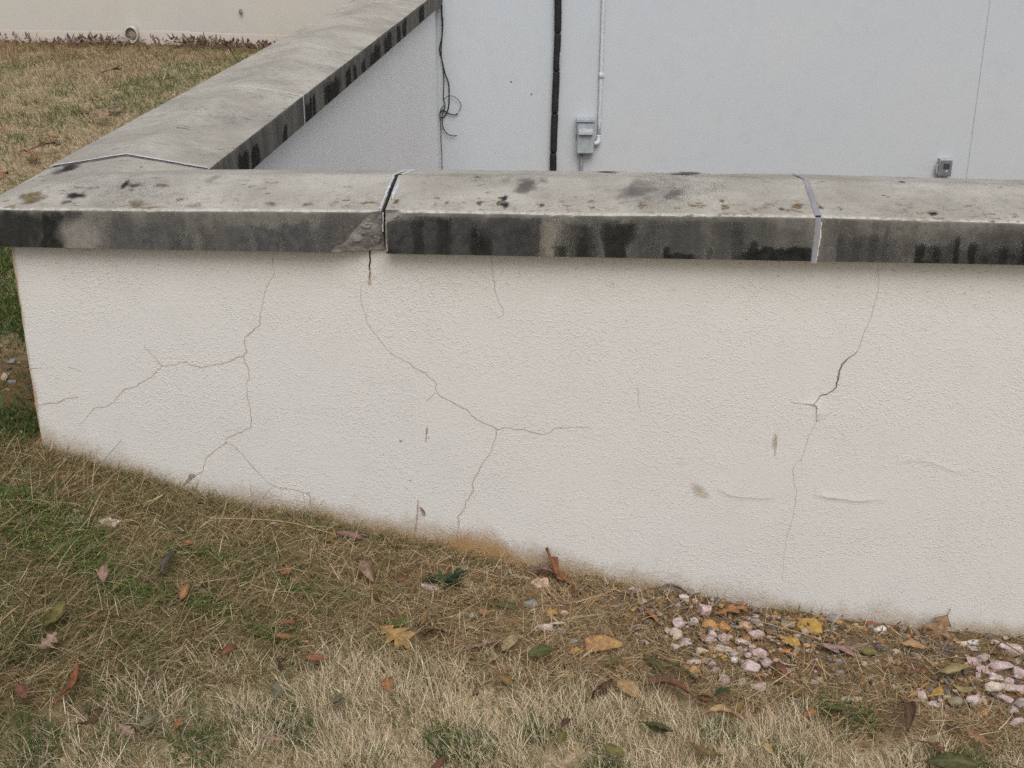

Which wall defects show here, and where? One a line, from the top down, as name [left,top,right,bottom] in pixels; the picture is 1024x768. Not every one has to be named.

leakage [306,5,424,123]
leakage [239,145,261,169]
leakage [0,193,101,248]
leakage [217,222,316,252]
leakage [386,180,634,258]
leakage [664,226,694,259]
leakage [708,221,812,261]
leakage [914,239,1024,265]
crack [42,258,312,515]
crack [360,251,591,537]
crack [782,274,880,580]